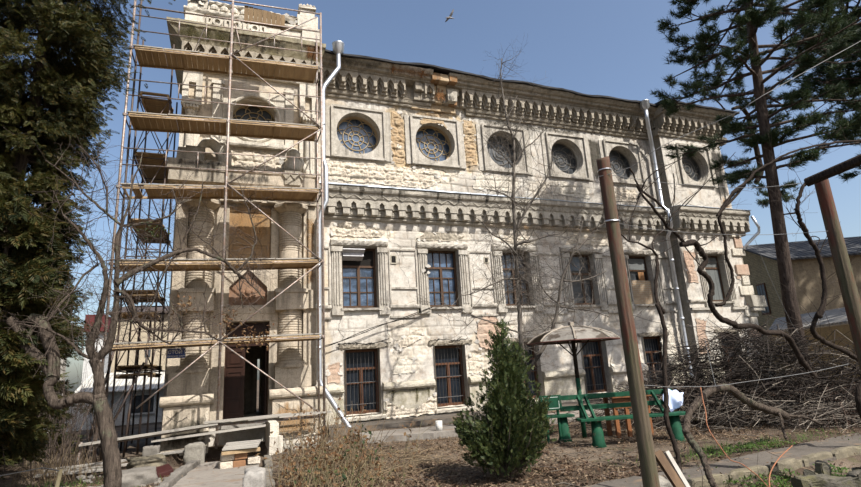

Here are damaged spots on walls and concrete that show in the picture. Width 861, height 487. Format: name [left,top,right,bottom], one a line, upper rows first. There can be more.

flaking render [326,111,441,189]
flaking render [416,110,521,192]